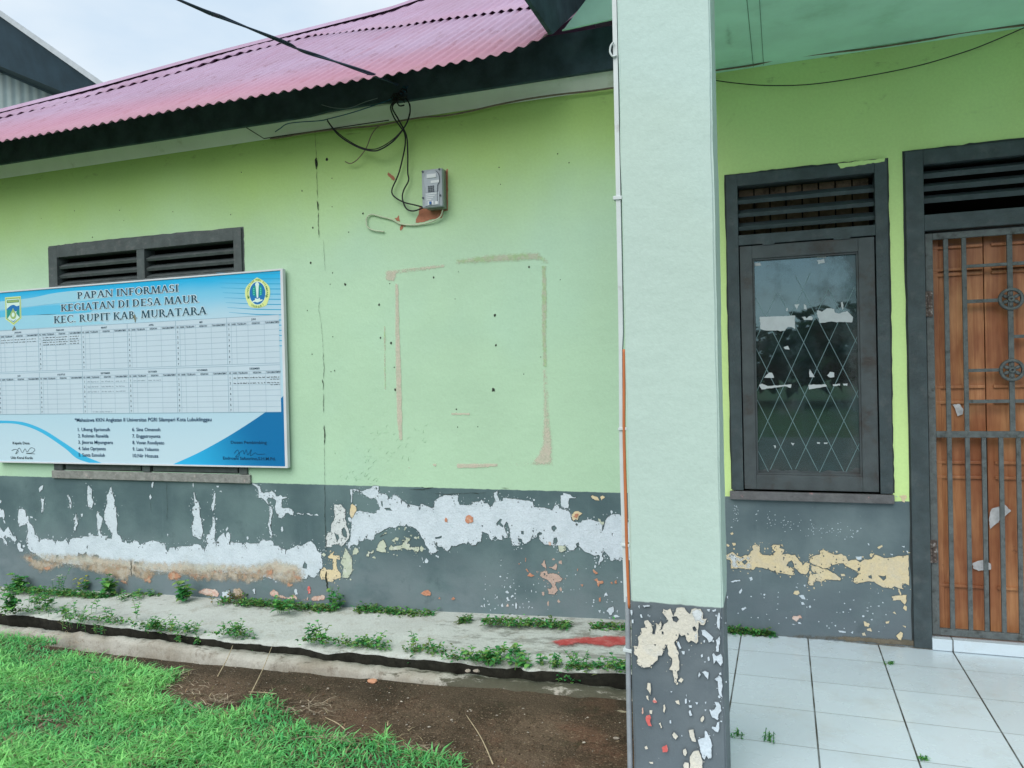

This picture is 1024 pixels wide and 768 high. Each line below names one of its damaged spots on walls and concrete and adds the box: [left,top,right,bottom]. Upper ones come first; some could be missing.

peeling [0,483,727,768]
peeling [726,505,911,636]